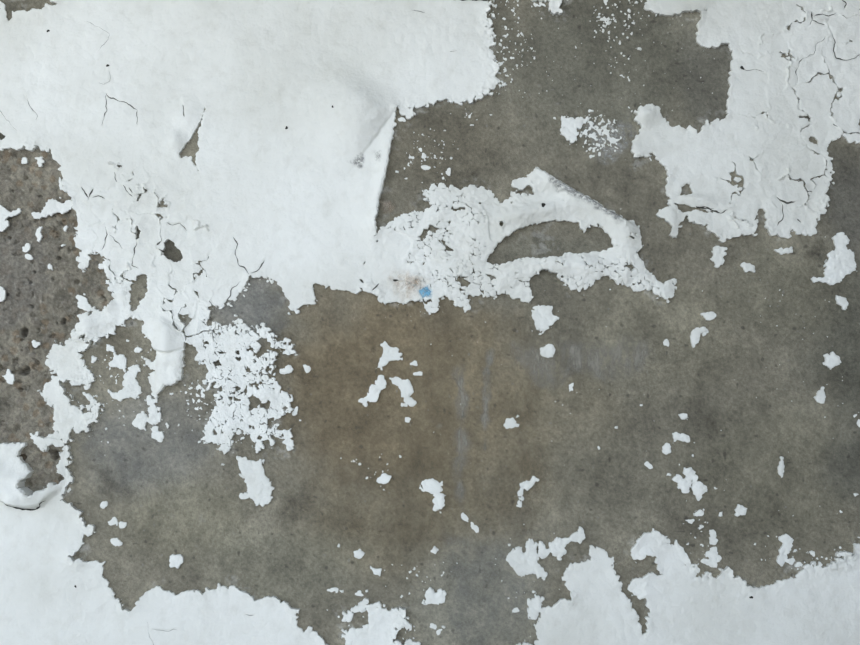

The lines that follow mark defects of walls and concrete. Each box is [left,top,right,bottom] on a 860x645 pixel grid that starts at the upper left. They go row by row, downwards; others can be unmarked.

peeling [0,0,56,21]
crack [100,72,138,123]
crack [781,0,859,134]
spalling [0,147,131,492]
crack [81,166,185,282]
peeling [129,274,148,311]
peeling [161,240,183,262]
crack [226,237,264,303]
peeling [354,167,677,315]
crack [696,159,753,213]
crack [777,154,826,226]
peeling [195,309,297,454]